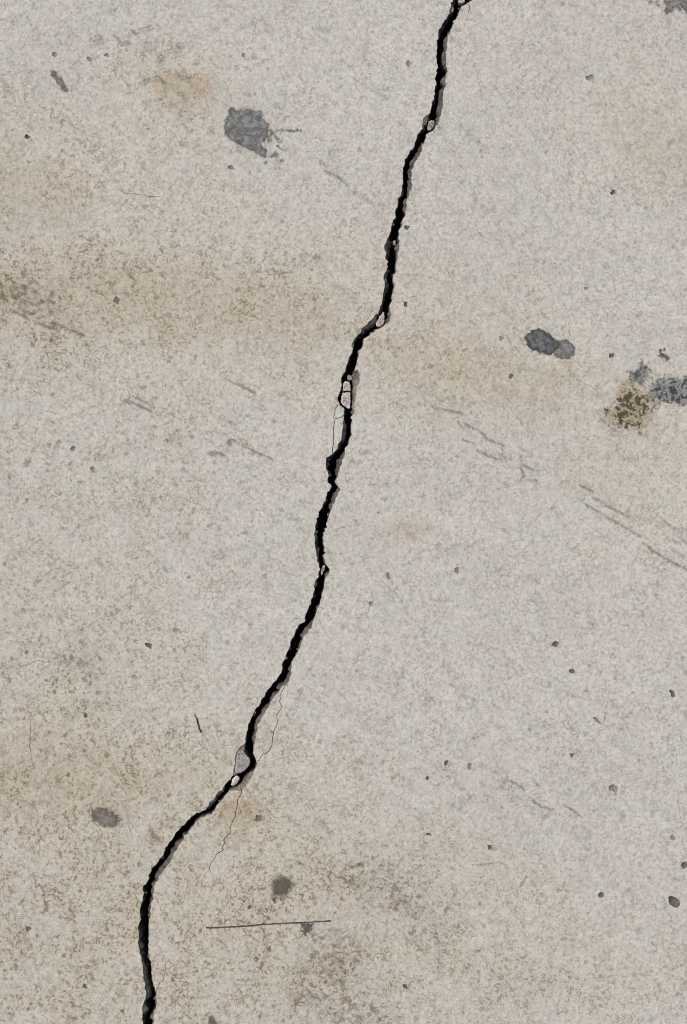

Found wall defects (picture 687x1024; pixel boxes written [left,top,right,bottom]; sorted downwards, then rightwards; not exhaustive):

crack [138,0,472,1024]